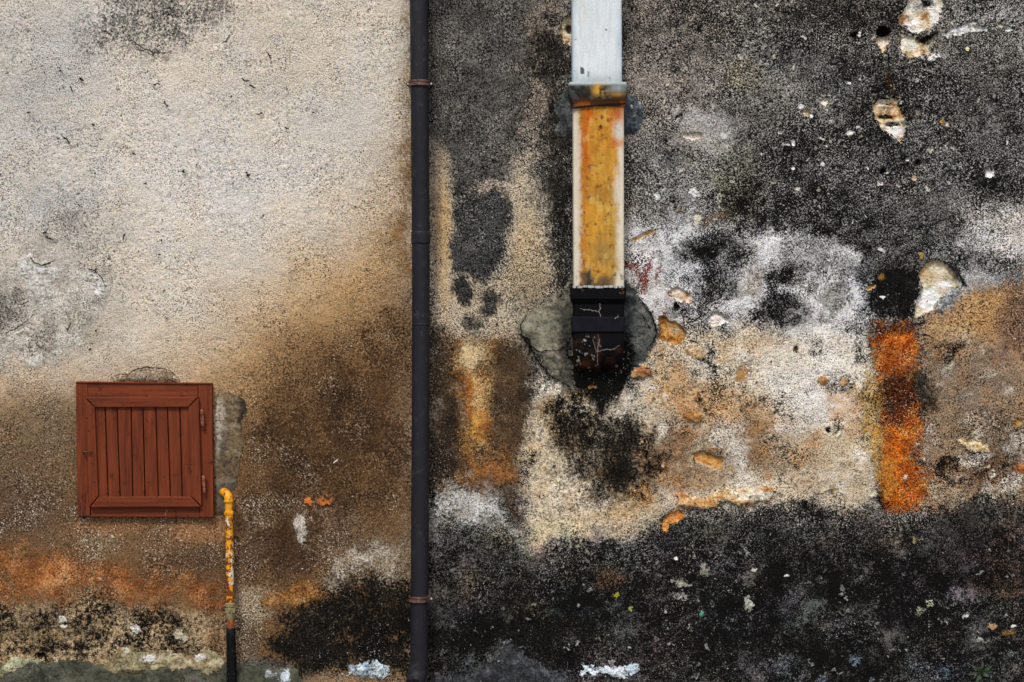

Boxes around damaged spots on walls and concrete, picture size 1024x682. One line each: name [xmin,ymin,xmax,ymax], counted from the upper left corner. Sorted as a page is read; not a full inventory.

spalling [872,0,990,143]
damp [428,0,545,334]
damp [733,260,767,304]
damp [772,231,857,316]
spalling [914,252,967,320]
damp [243,301,412,682]
rust [448,336,523,489]
damp [547,339,646,504]
peeling [659,437,781,533]
rust [856,319,940,546]
rust [0,535,226,621]
damp [580,662,640,679]